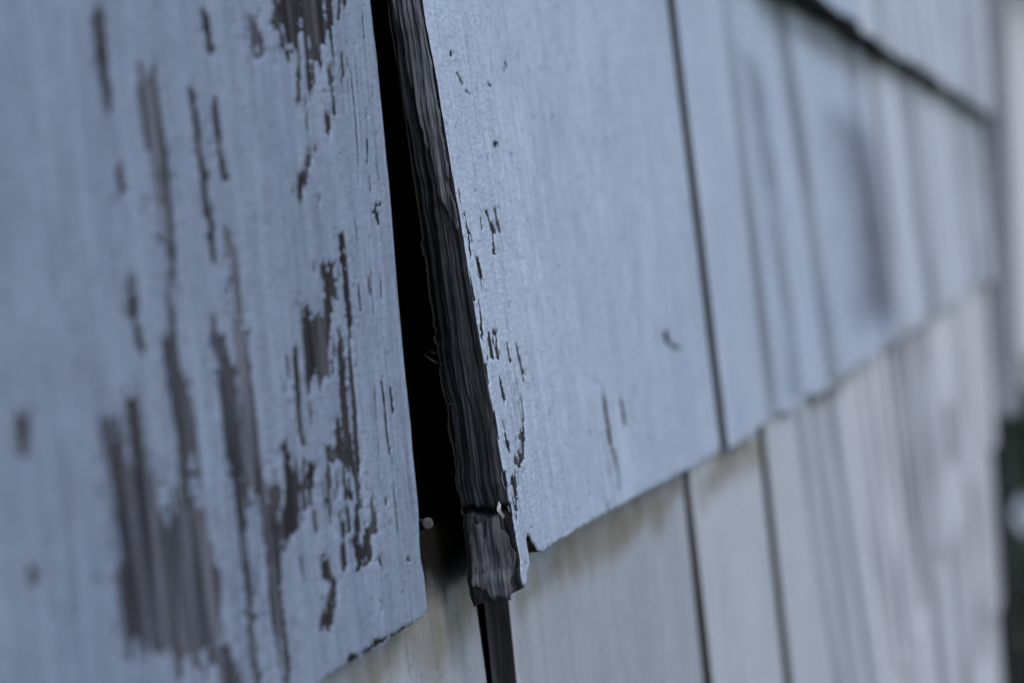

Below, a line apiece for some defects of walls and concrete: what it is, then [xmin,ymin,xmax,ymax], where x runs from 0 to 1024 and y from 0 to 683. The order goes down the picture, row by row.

peeling [90,6,112,117]
peeling [198,7,216,58]
peeling [244,0,347,205]
peeling [480,207,501,255]
peeling [93,62,387,683]
crack [369,265,382,314]
crack [458,190,499,440]
peeling [486,328,526,383]
crack [374,380,398,534]
crack [464,471,518,568]
peeling [470,376,525,601]